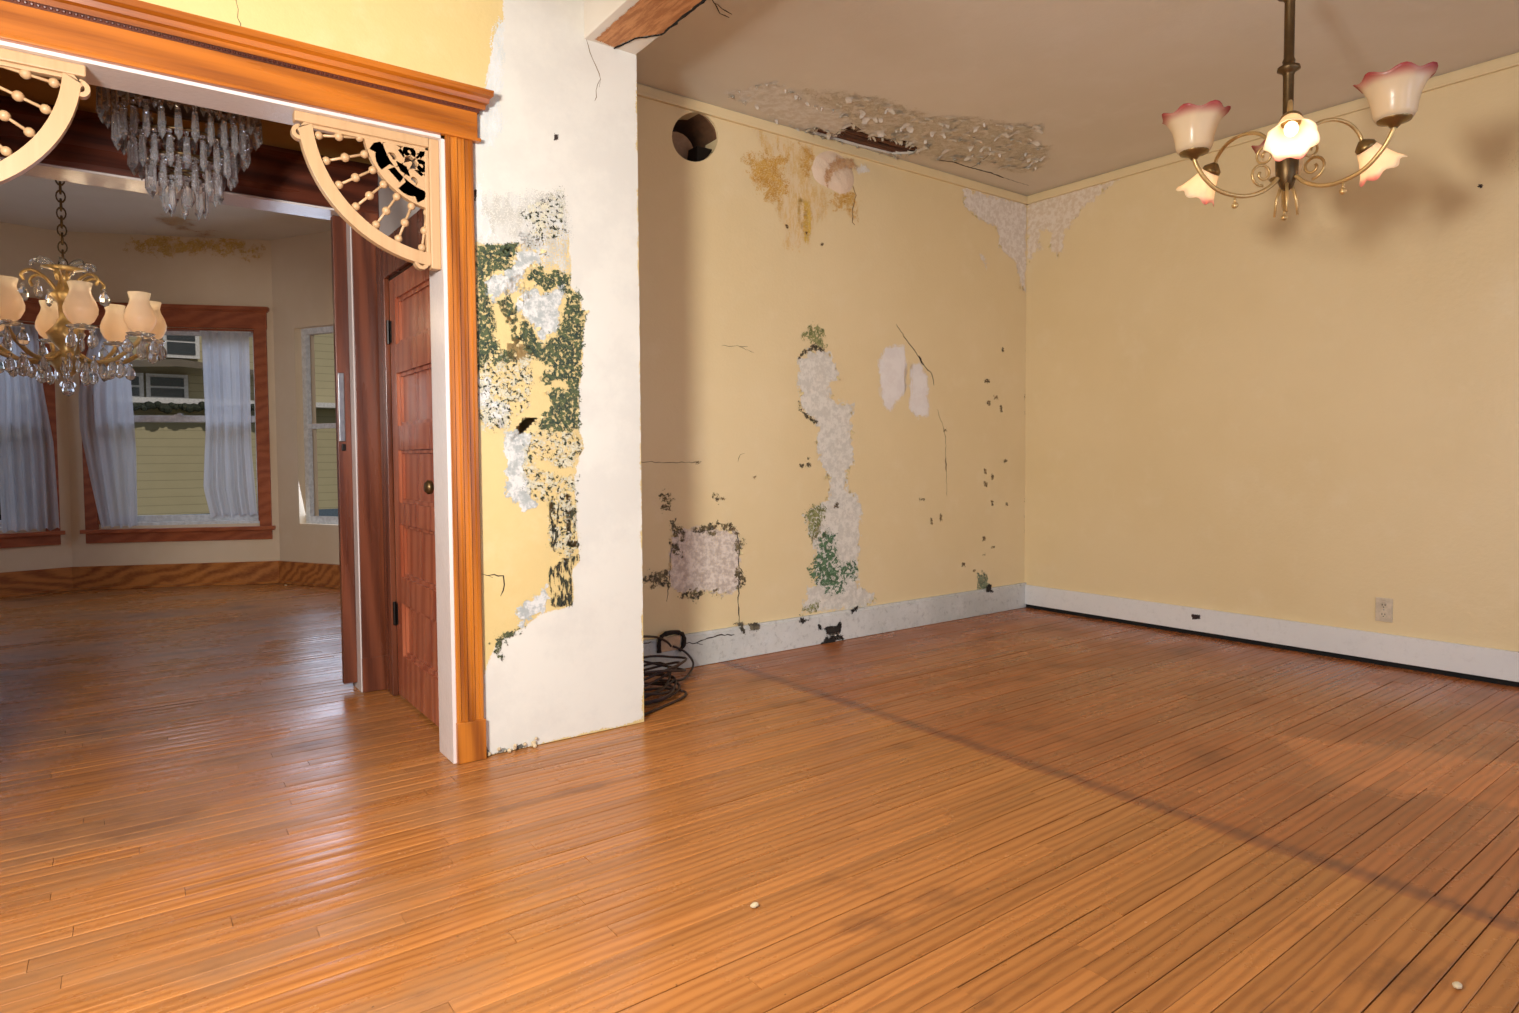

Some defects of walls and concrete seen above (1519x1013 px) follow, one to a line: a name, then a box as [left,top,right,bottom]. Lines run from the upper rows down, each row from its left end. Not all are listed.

peeling [722,80,1054,173]
damp [740,129,862,254]
peeling [962,179,1120,292]
peeling [795,324,877,644]
peeling [643,518,747,603]